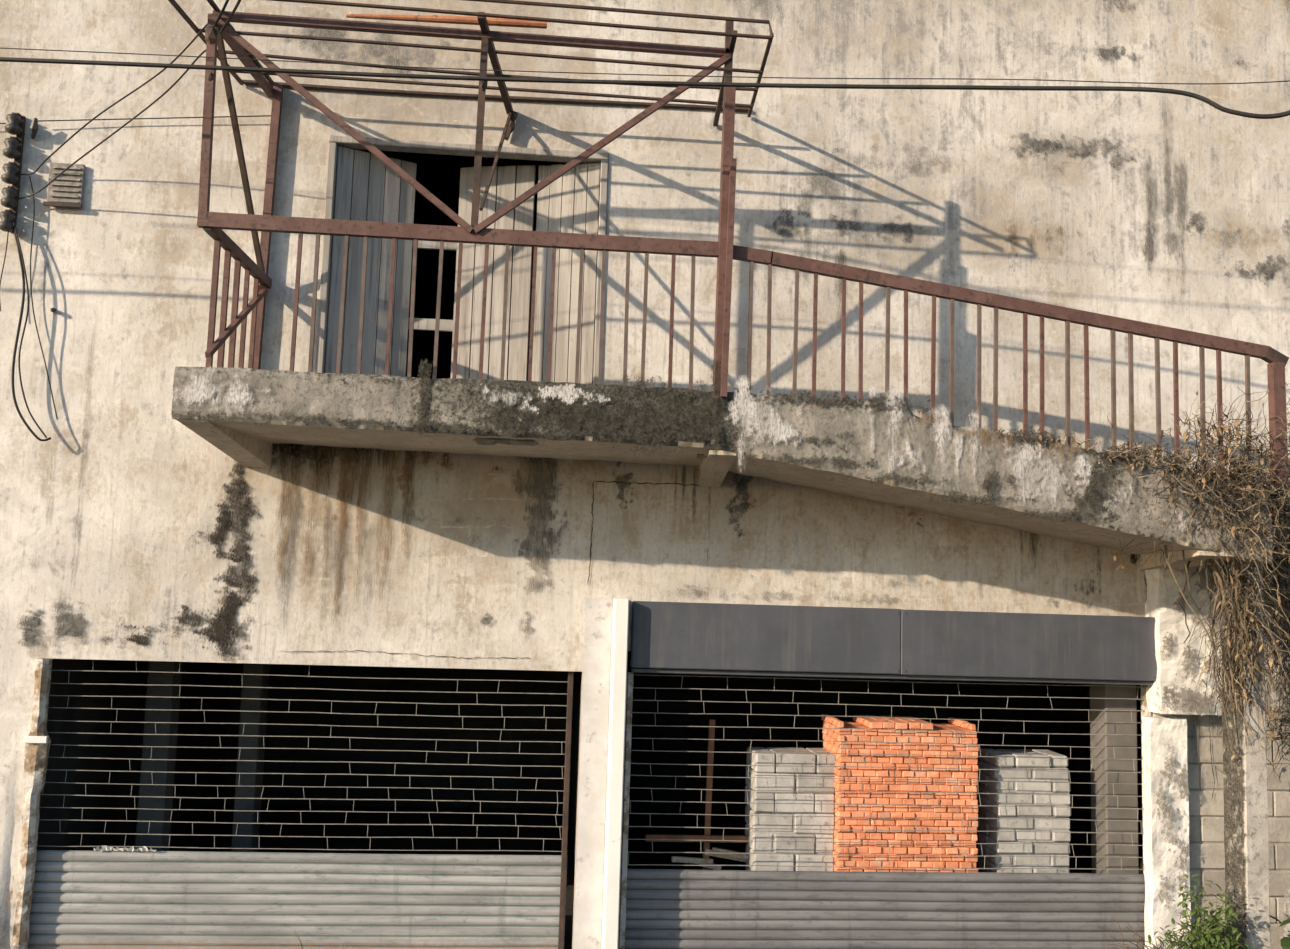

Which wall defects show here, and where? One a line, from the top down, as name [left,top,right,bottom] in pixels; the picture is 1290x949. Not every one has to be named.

damp [1017,133,1204,266]
mould [1225,256,1288,284]
damp [19,462,261,661]
damp [171,359,474,613]
damp [492,457,567,589]